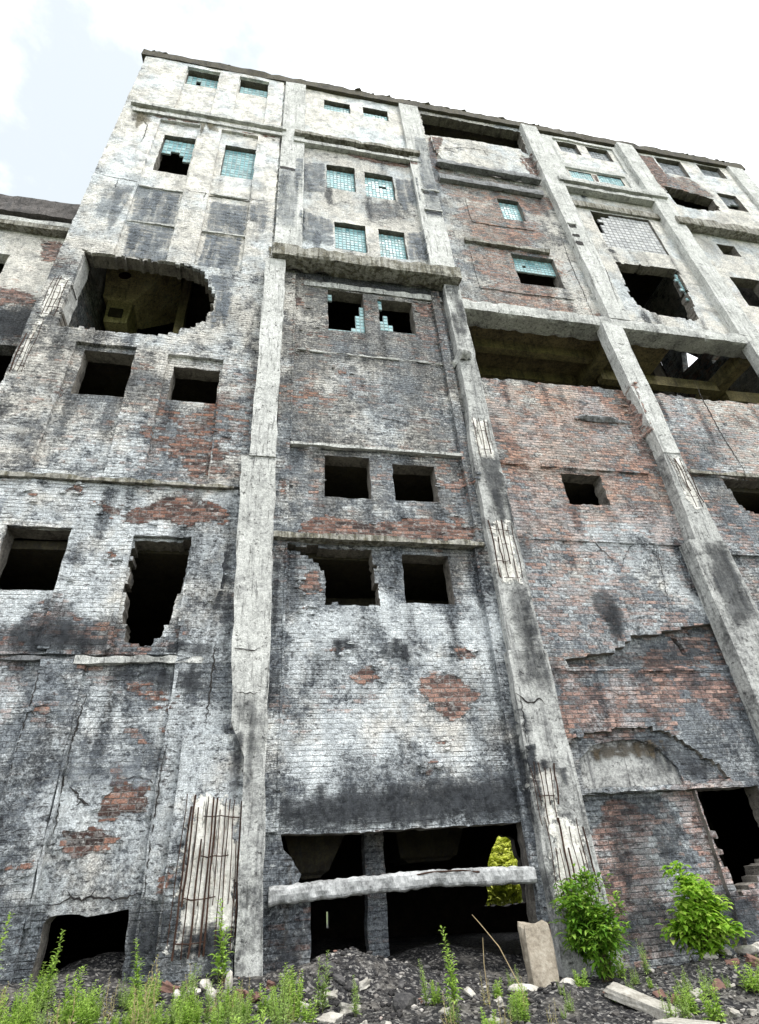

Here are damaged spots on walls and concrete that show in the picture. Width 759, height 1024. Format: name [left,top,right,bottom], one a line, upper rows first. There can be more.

peeling [160,428,233,479]
spalling [471,417,496,460]
crack [694,380,744,469]
peeling [90,495,231,527]
peeling [297,512,524,585]
water stain [604,604,623,643]
crack [6,673,39,784]
crack [53,693,89,833]
crack [205,641,260,724]
peeling [418,664,481,721]
peeling [53,761,155,862]
spalling [522,762,601,923]